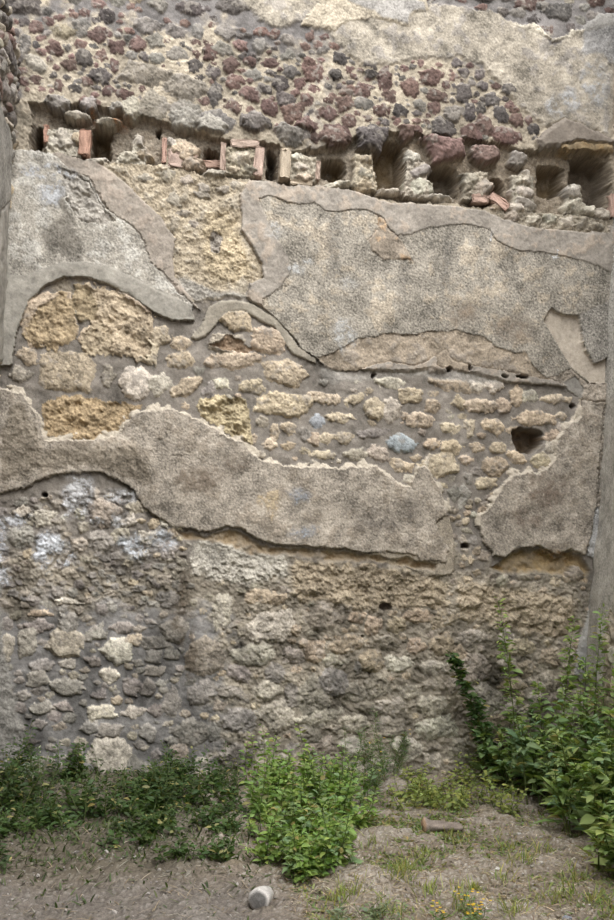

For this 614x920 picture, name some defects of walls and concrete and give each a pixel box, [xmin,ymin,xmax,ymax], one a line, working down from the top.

spalling [14,4,539,153]
crack [366,212,414,266]
flaking render [544,308,605,383]
spalling [0,162,594,777]